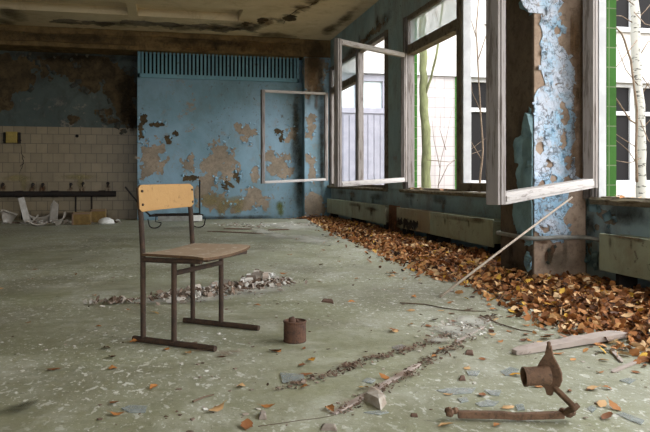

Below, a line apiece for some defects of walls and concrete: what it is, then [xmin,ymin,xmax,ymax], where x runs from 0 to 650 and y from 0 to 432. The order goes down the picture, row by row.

peeling [0,52,179,183]
peeling [234,122,259,147]
peeling [274,113,318,143]
peeling [513,0,581,189]
peeling [179,136,295,215]
peeling [304,153,328,217]
peeling [512,193,573,272]